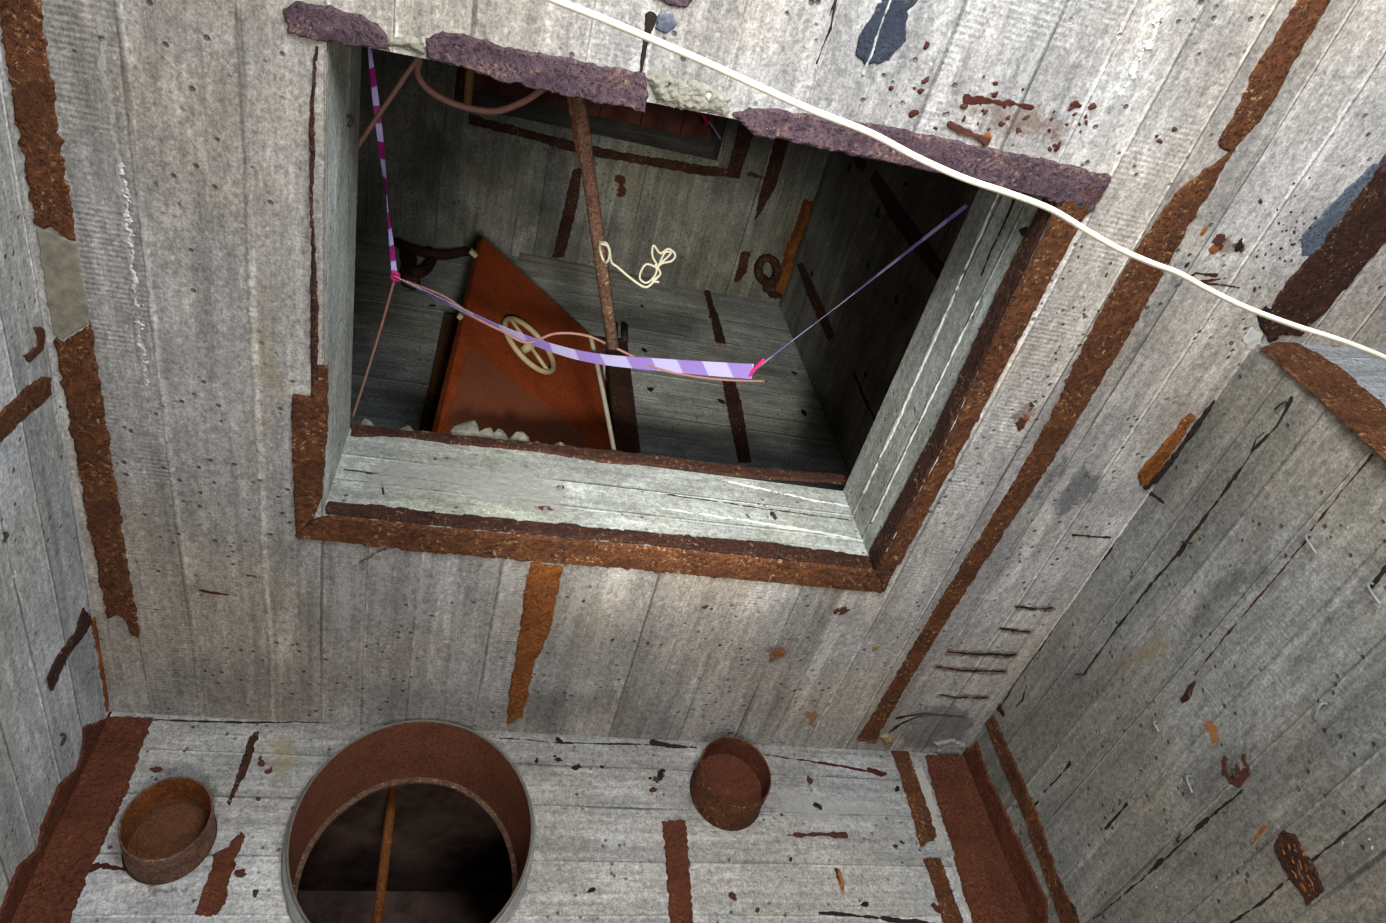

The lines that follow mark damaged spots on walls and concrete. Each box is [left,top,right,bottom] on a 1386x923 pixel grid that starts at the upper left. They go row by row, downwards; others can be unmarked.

rust [1200,177,1317,292]
rust [1015,395,1045,432]
rust [936,651,1016,672]
rust [1180,680,1196,703]
rust [1252,825,1324,905]